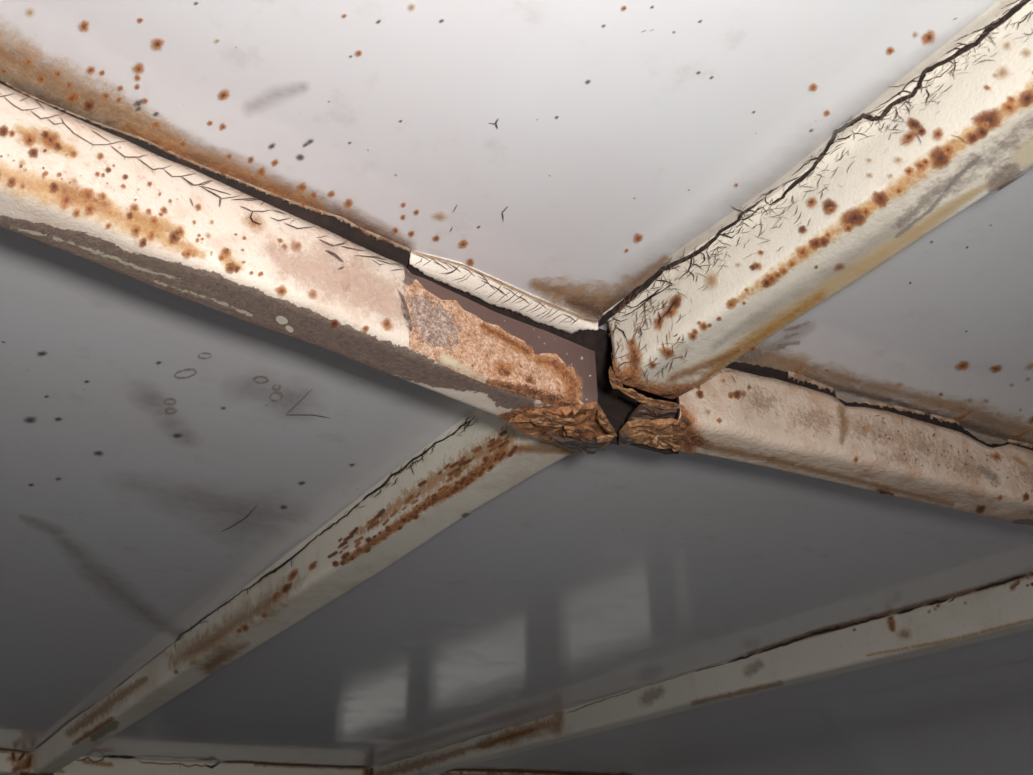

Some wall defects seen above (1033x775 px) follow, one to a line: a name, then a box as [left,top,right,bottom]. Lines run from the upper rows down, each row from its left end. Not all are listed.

corrosion [913,32,934,44]
corrosion [0,125,263,276]
corrosion [0,31,419,253]
crack [0,0,1033,386]
corrosion [689,82,1033,340]
corrosion [403,279,617,443]
corrosion [654,295,682,329]
crack [0,417,477,754]
corrosion [169,427,576,674]
corrosion [66,677,147,745]
corrosion [363,711,631,775]
corrosion [692,681,783,704]